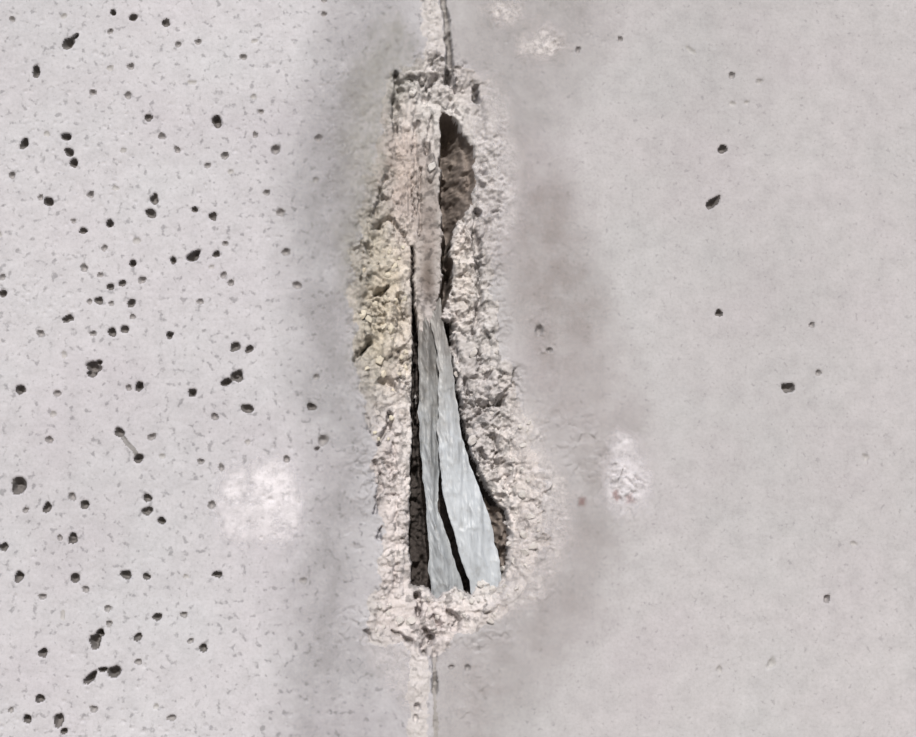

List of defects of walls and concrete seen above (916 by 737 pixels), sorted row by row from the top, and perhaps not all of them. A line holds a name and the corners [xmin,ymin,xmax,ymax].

crack [420,0,453,69]
spalling [344,52,552,659]
crack [404,652,439,737]